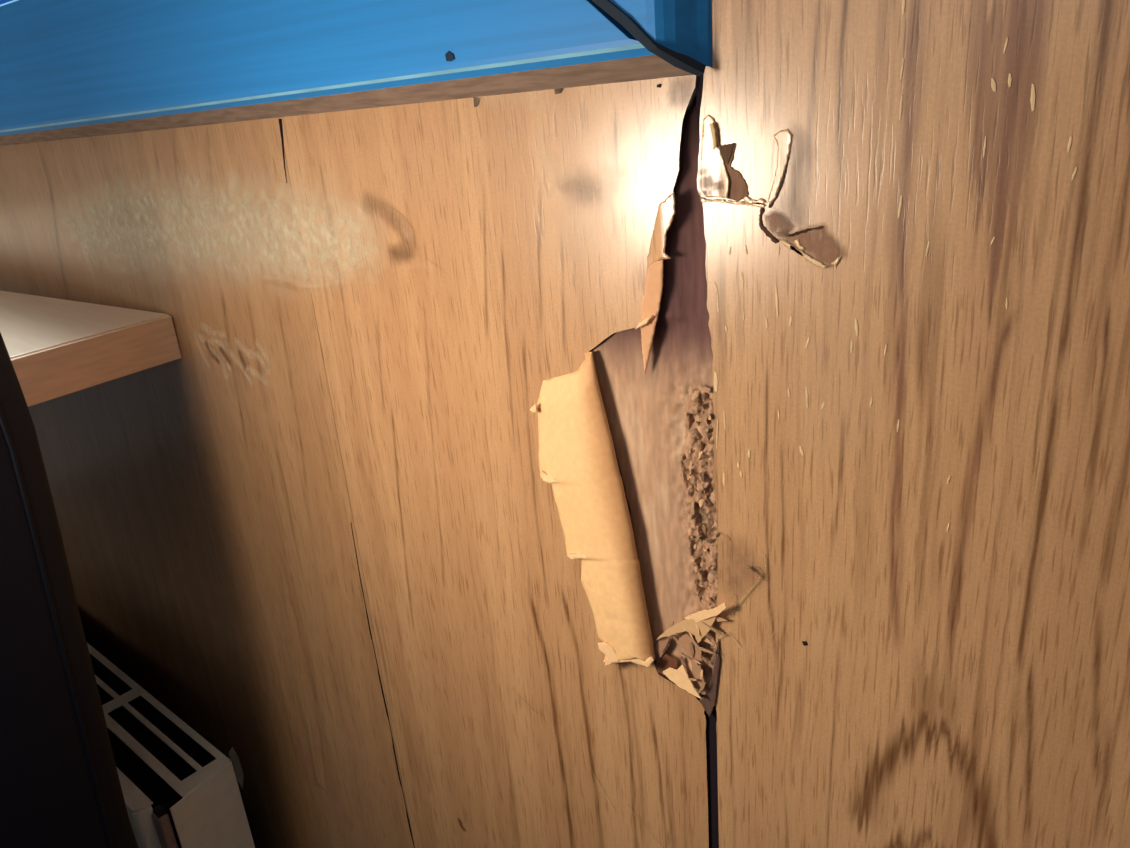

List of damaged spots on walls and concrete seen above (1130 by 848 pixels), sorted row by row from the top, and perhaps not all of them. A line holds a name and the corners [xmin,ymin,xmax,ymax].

crack [278,119,287,183]
crack [696,74,704,131]
peeling [701,115,749,202]
spalling [654,385,727,699]
crack [351,525,415,848]
crack [699,639,721,848]